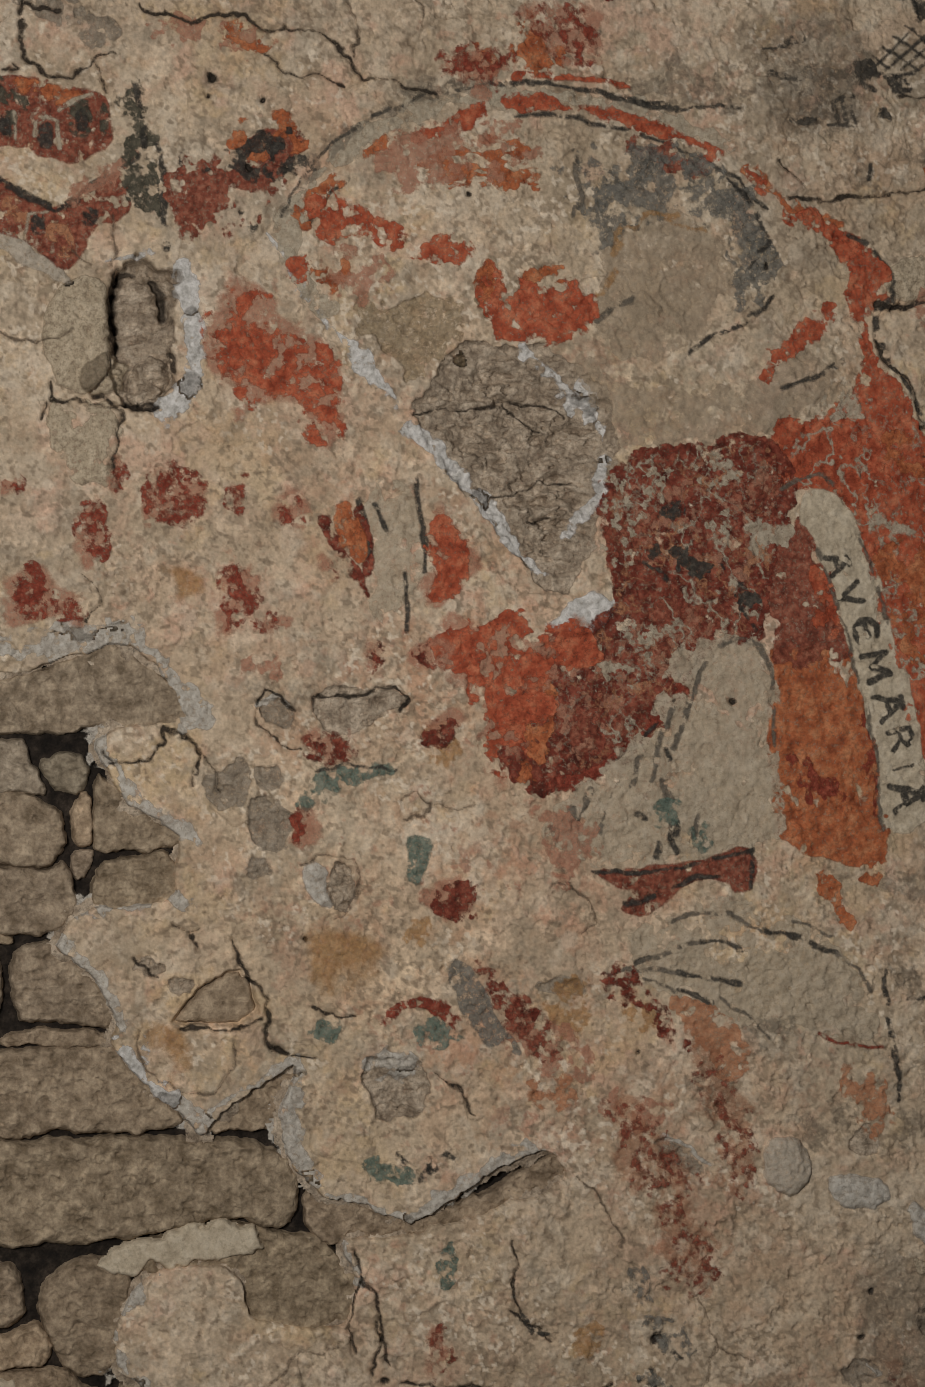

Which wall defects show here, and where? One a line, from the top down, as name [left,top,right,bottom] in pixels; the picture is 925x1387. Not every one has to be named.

crack [2,0,116,92]
crack [139,2,437,95]
spalling [106,232,619,594]
spalling [0,560,564,1387]
crack [270,1251,481,1387]
crack [510,1240,552,1342]